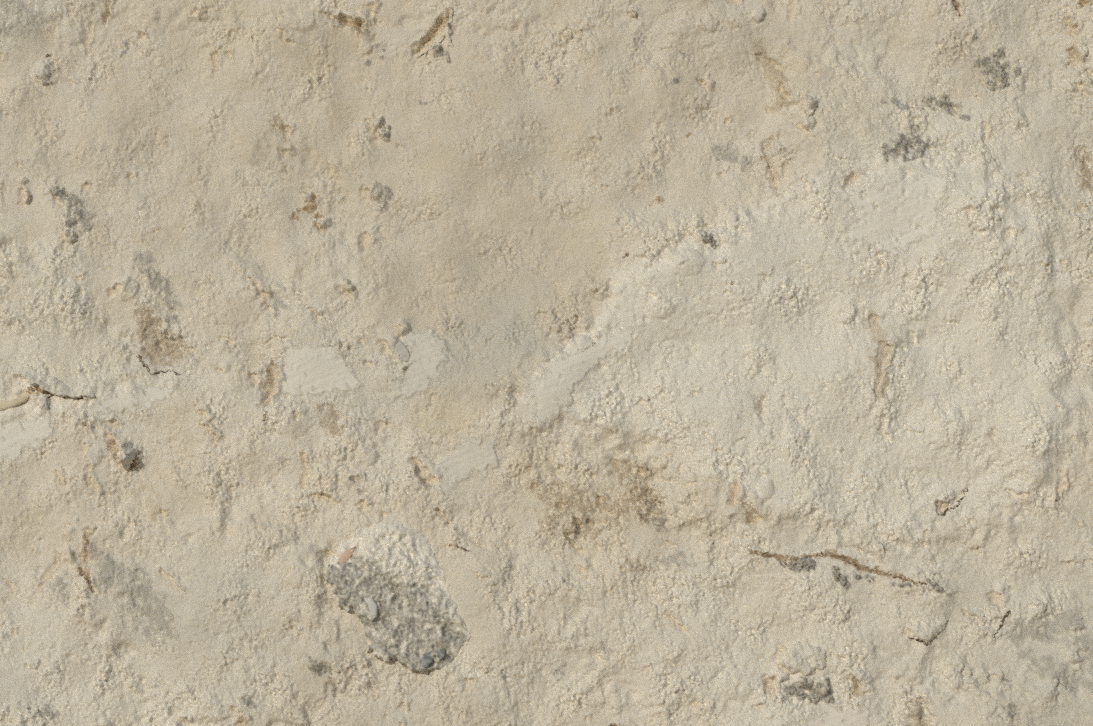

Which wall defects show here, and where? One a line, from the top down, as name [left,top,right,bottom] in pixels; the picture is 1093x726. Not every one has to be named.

crack [751,550,928,585]